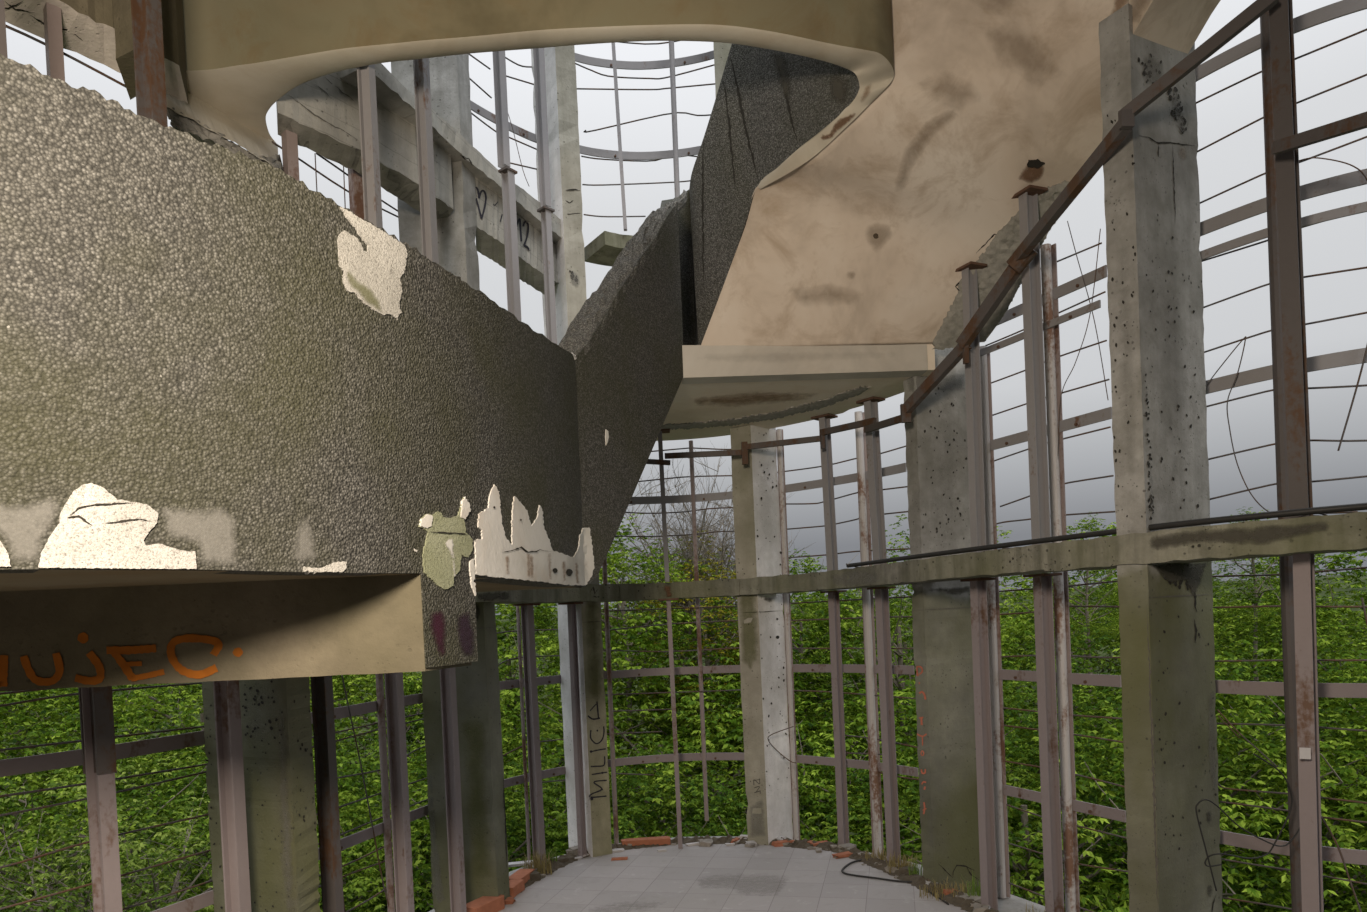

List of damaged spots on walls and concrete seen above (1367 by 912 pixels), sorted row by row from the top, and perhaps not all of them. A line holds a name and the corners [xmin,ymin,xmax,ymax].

flaking render [337,207,407,320]
flaking render [0,541,11,567]
flaking render [38,483,197,569]
flaking render [414,485,595,596]